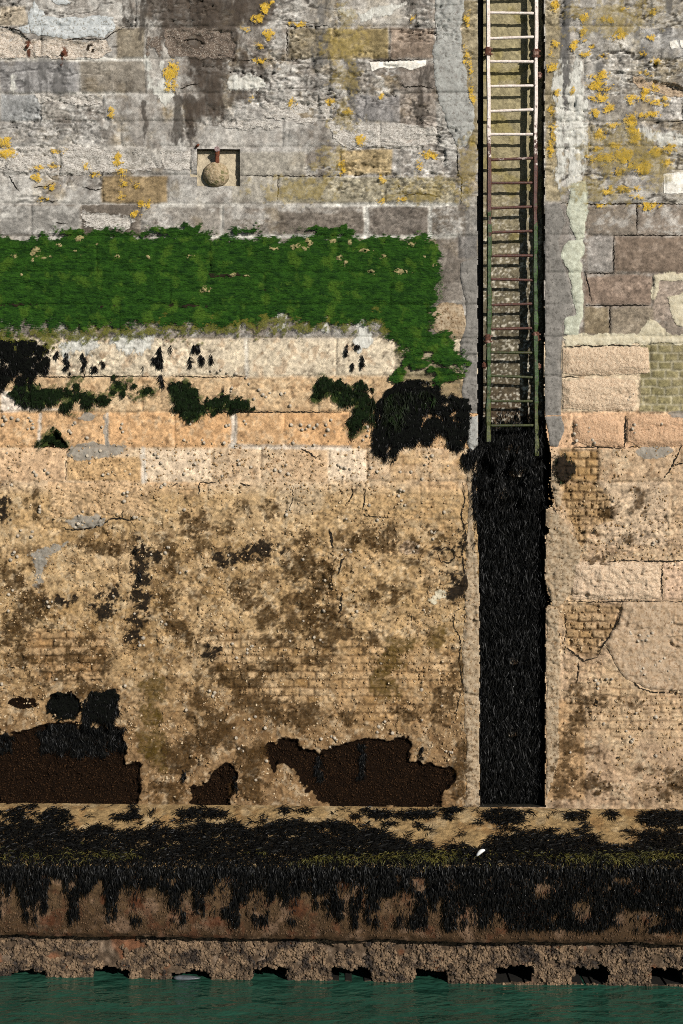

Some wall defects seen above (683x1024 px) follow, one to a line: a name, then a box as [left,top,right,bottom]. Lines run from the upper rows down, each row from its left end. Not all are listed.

damp [123,0,274,145]
peeling [260,470,480,807]
crack [562,559,683,681]
peeling [0,691,143,804]
peeling [190,762,239,805]